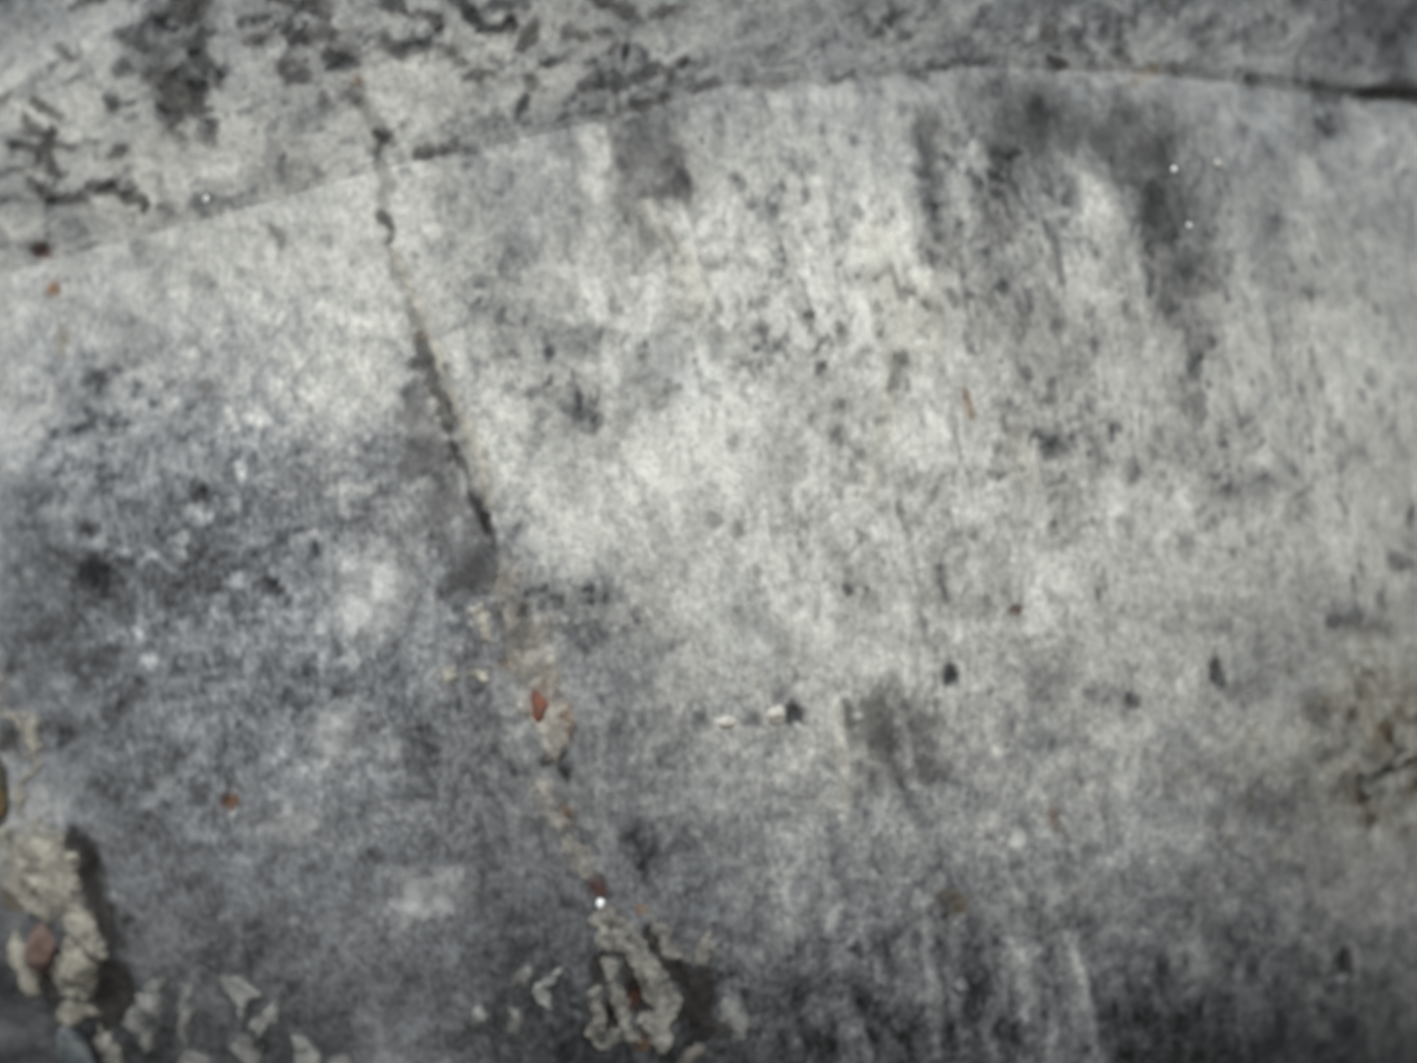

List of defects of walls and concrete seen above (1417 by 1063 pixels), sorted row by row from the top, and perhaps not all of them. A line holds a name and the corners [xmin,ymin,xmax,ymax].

crack [908,59,988,76]
crack [1046,53,1068,69]
crack [1310,76,1417,107]
crack [375,212,493,536]
spalling [441,668,488,684]
spalling [469,567,749,1061]
spalling [0,711,165,1063]
peeling [177,984,209,1063]
peeling [219,975,278,1063]
peeling [292,1036,350,1063]